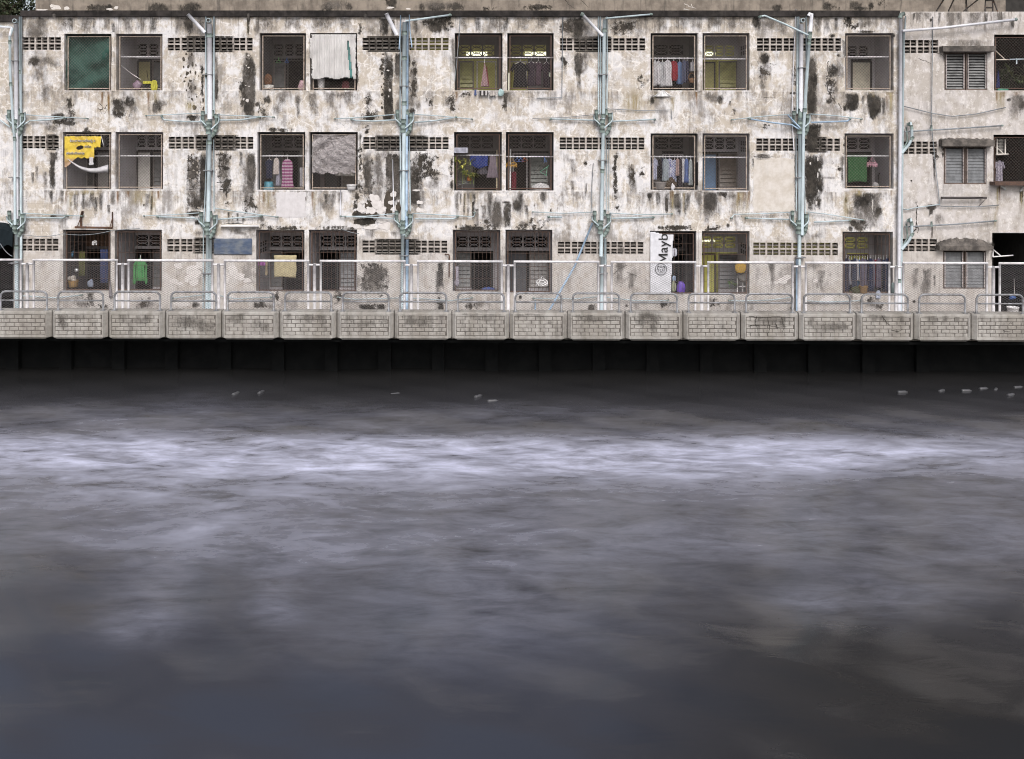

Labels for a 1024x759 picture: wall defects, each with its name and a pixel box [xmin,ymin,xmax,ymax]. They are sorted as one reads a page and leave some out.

water stain [61,3,233,121]
water stain [186,135,297,254]
water stain [239,0,553,310]
flaking render [351,191,447,252]
water stain [790,0,885,210]
water stain [845,193,882,232]